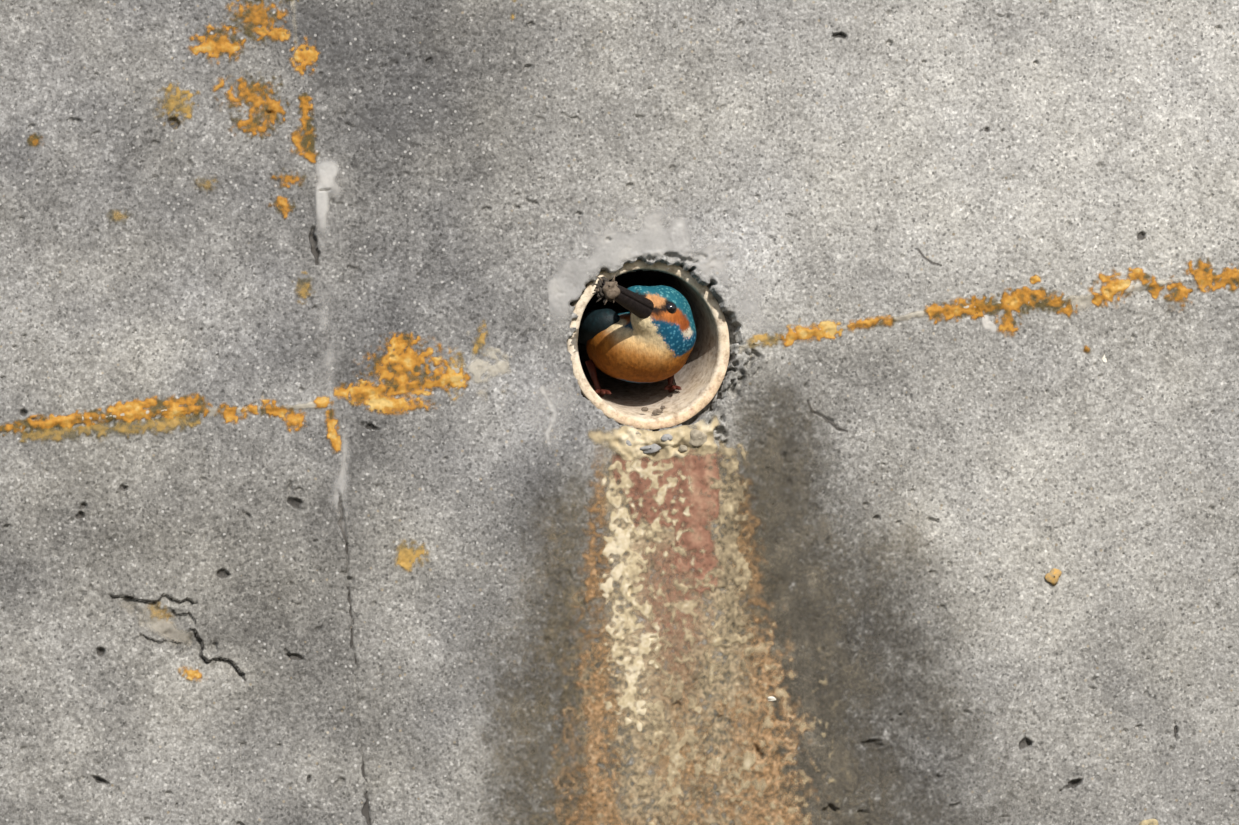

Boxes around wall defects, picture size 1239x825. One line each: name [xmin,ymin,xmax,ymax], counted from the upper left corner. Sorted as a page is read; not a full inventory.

crack [338,501,348,553]
spalling [110,595,246,681]
crack [347,586,356,663]
corrosion [583,449,811,825]
corrosion [557,619,631,825]
crack [361,762,371,825]